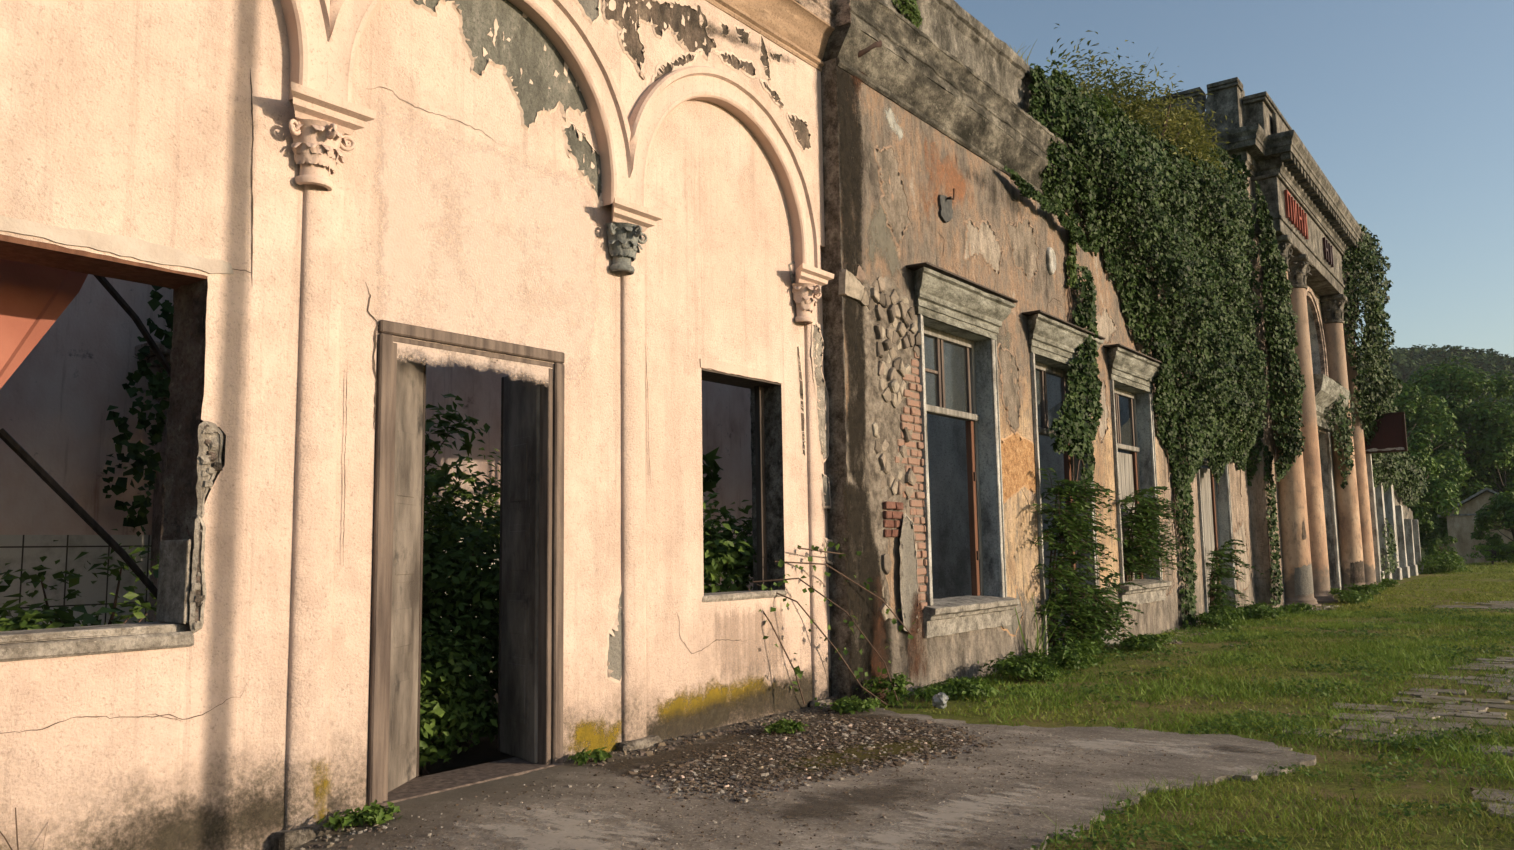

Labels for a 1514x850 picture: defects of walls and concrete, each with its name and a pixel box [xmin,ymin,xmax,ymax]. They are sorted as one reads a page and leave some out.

crack [373,87,491,138]
peeling [409,0,612,211]
peeling [574,0,812,152]
leakage [569,66,1048,850]
peeling [605,580,624,684]
crack [0,684,247,734]
leakage [97,788,286,850]